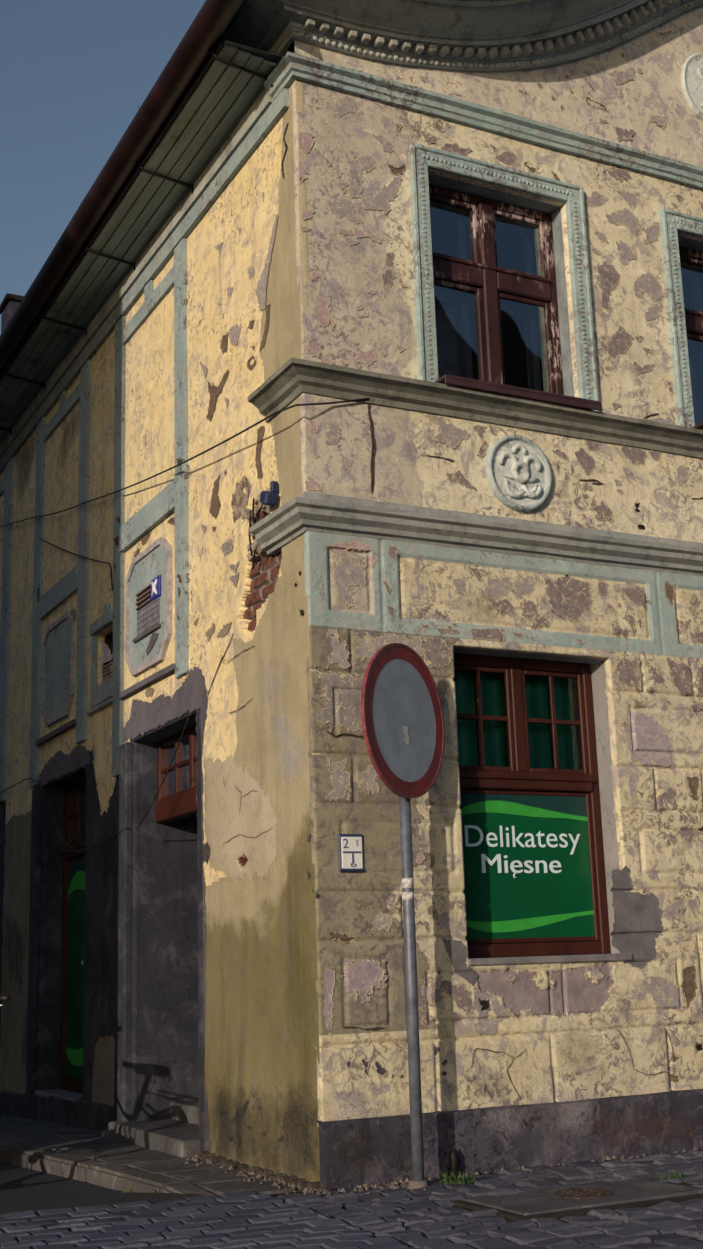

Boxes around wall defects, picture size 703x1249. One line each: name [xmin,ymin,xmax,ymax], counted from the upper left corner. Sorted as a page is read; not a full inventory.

crack [280,123,288,179]
peeling [298,118,472,298]
peeling [584,166,661,310]
peeling [607,324,655,374]
spalling [200,362,229,422]
crack [367,403,376,493]
peeling [552,439,602,498]
spalling [176,425,282,644]
crack [223,780,273,844]
spalling [418,845,699,1035]
crack [471,1048,526,1097]
damp [204,1091,317,1174]